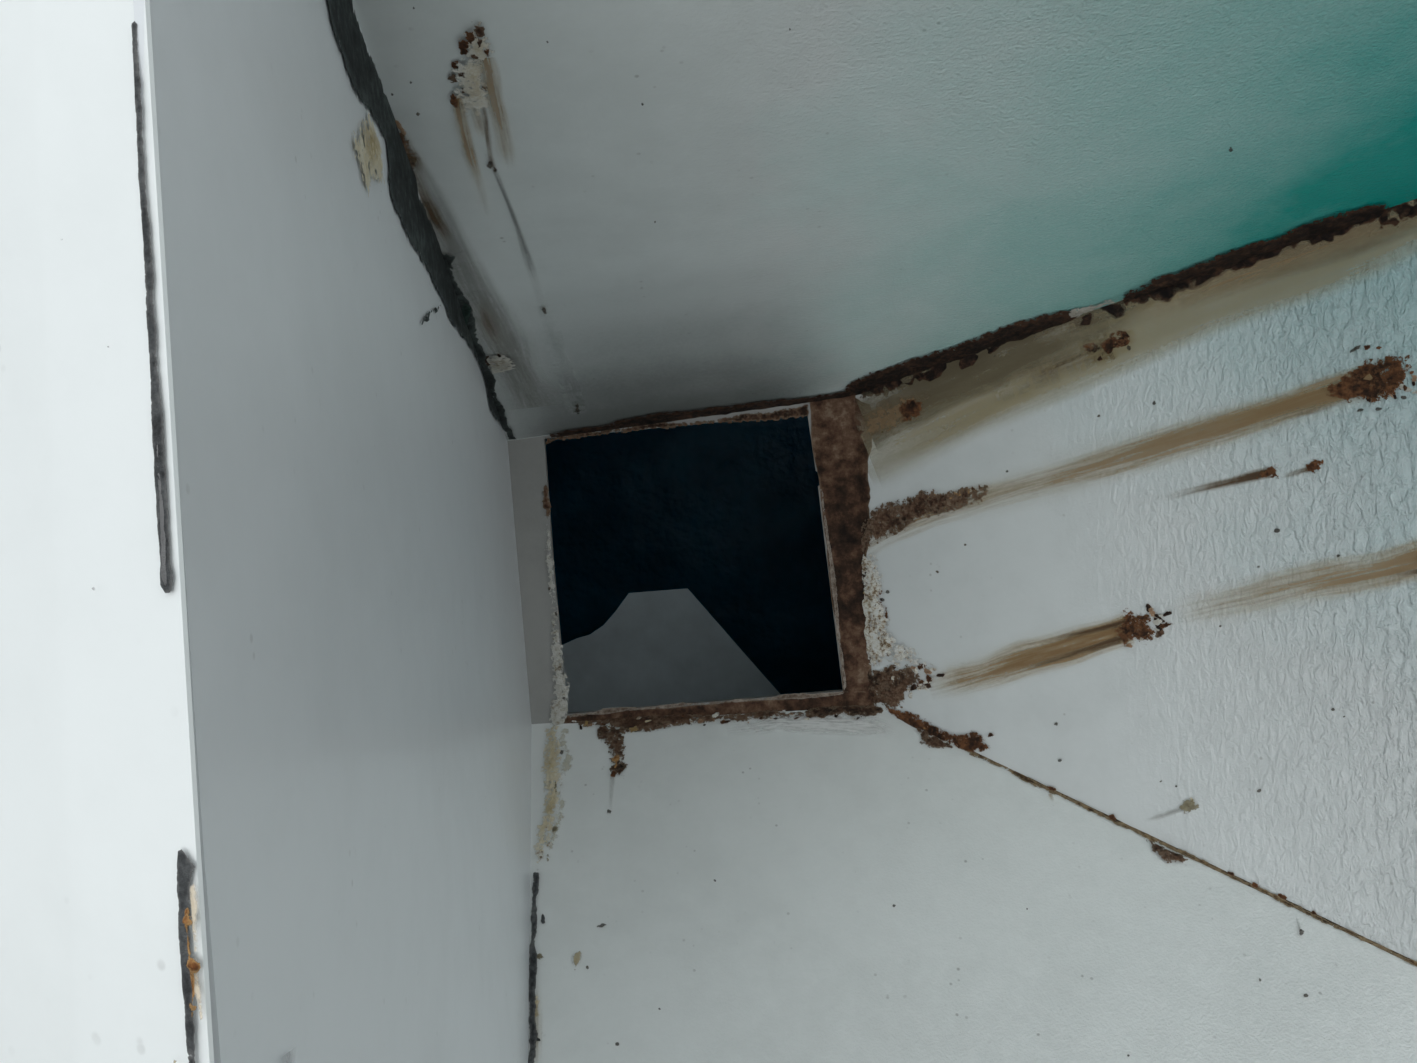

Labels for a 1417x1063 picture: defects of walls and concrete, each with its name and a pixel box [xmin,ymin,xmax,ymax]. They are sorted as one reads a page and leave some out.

rust [448,22,504,169]
rust [1040,330,1131,375]
rust [546,345,1417,779]
crack [960,746,1417,967]